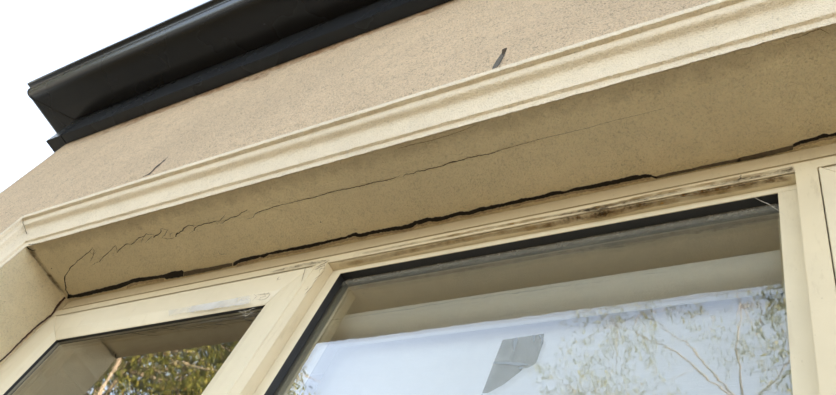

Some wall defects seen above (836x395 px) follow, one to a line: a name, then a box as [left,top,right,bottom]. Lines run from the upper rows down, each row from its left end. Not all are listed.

crack [0,108,836,362]